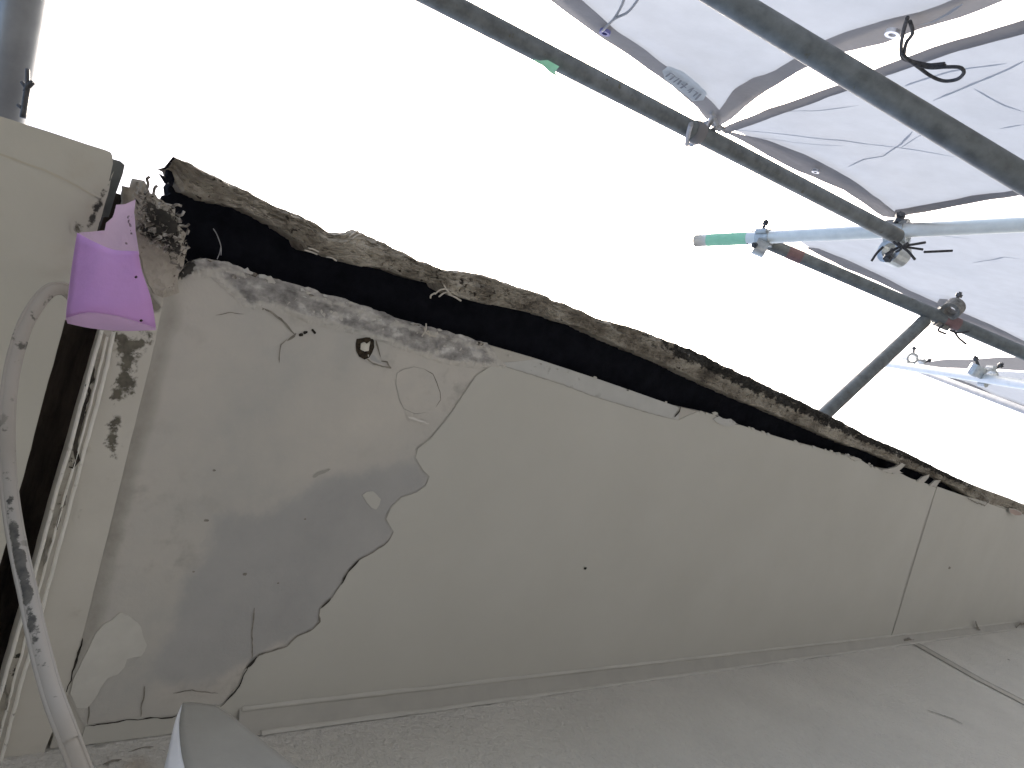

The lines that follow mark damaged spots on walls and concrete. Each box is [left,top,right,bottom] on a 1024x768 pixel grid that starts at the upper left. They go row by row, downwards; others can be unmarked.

water stain [99,330,156,462]
spalling [699,411,770,436]
peeling [68,175,681,726]
spalling [794,440,906,474]
spalling [916,474,941,487]